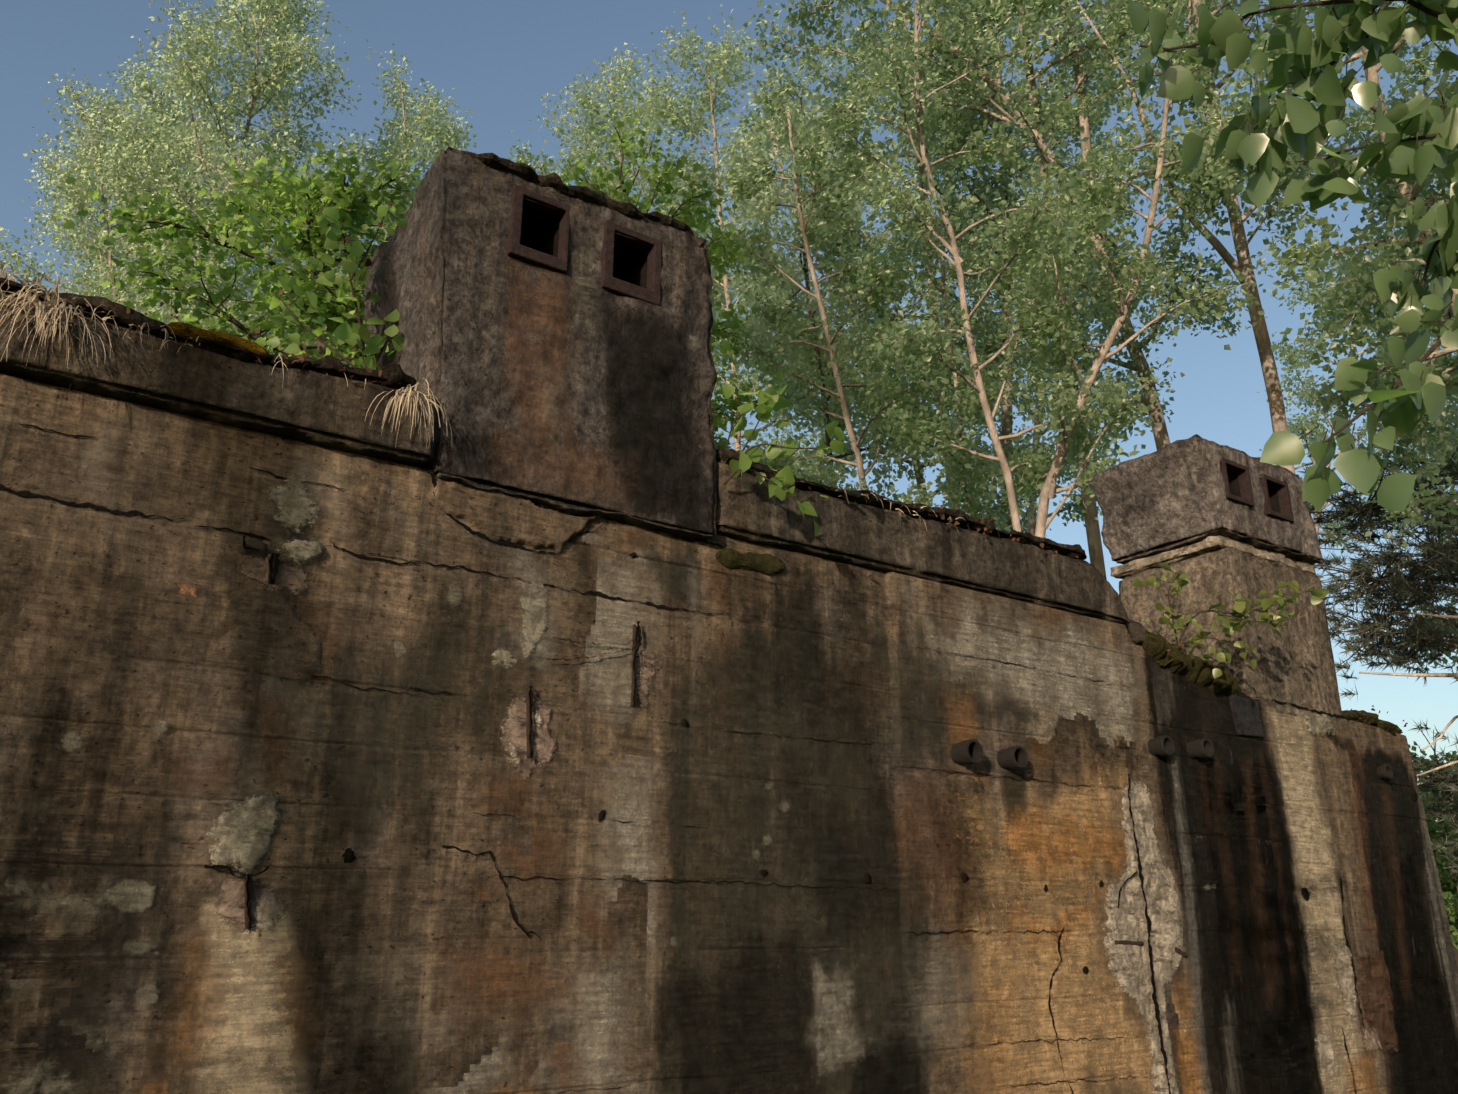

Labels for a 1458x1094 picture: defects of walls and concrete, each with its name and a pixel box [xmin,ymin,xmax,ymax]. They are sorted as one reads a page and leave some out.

leakage [587,289,708,530]
crack [0,484,271,541]
spalling [239,477,326,596]
crack [326,465,730,615]
spalling [500,686,557,780]
spalling [204,794,287,934]
crack [442,812,888,941]
leakage [603,567,943,1094]
crack [912,926,1152,1094]
spalling [1103,774,1188,1094]
leakage [1145,654,1322,1094]
leakage [1326,731,1458,1094]